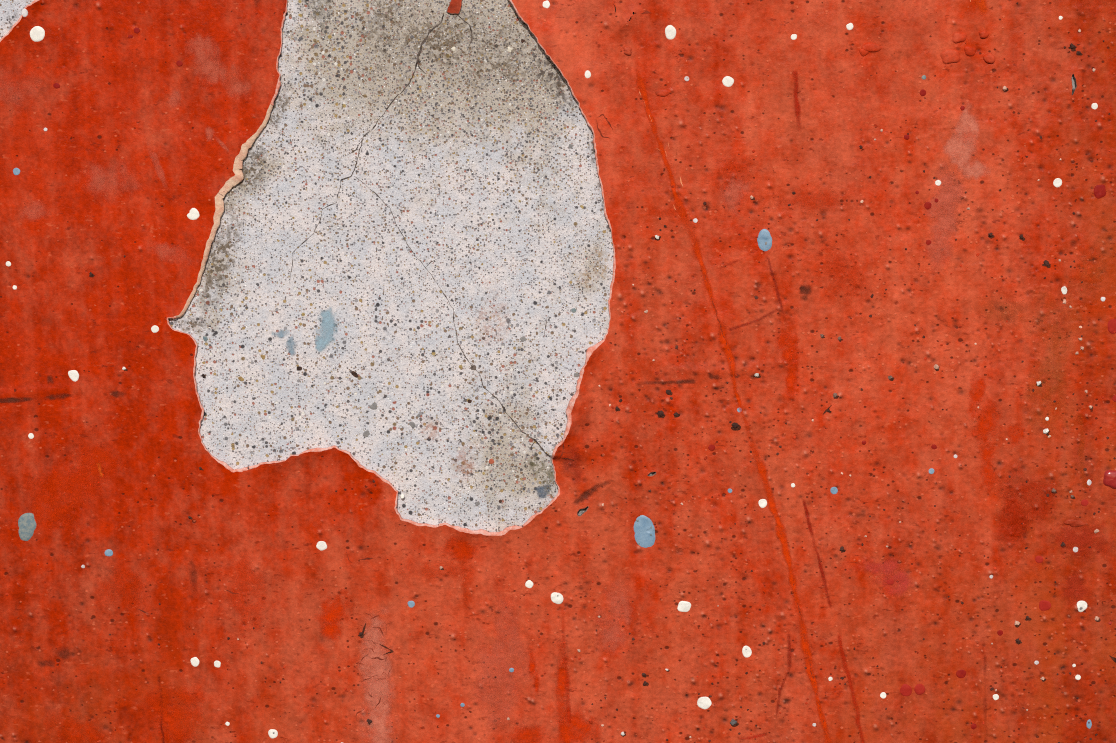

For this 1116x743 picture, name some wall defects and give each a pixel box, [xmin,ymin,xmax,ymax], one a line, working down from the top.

peeling [0,0,39,42]
peeling [167,0,616,536]
crack [290,14,574,461]